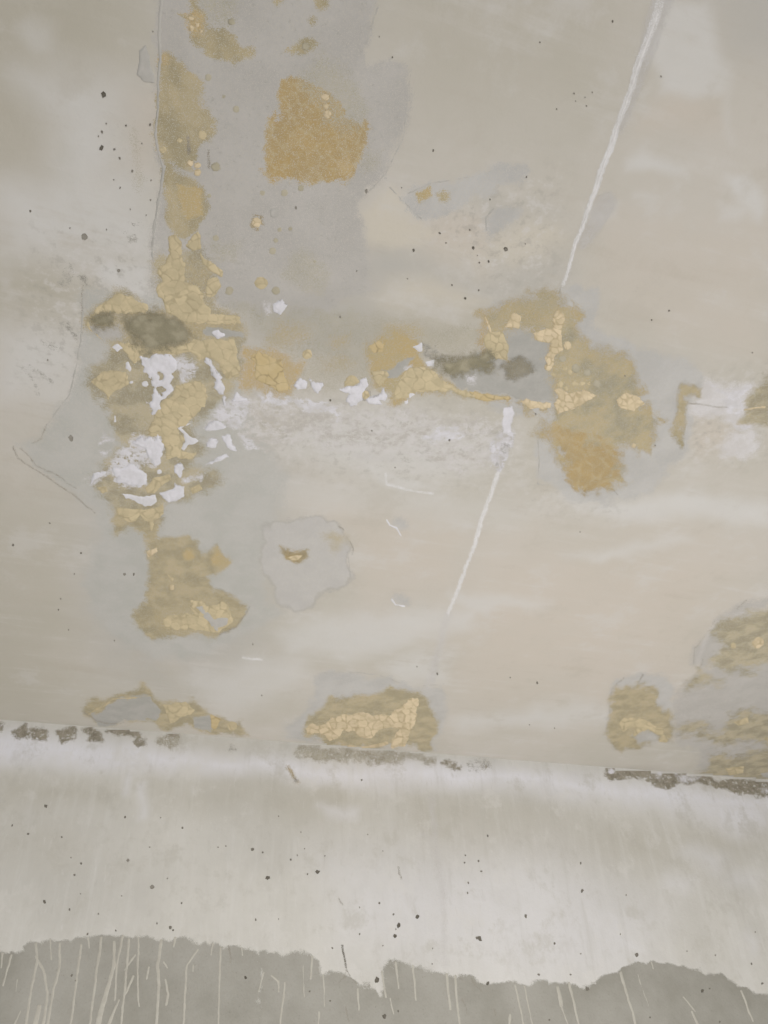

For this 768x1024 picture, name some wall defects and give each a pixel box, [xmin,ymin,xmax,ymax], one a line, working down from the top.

water stain [258,0,384,187]
crack [562,0,674,287]
water stain [78,50,703,641]
peeling [448,328,557,415]
crack [422,406,516,691]
spalling [0,721,182,751]
peeling [281,669,492,772]
spalling [602,768,768,800]